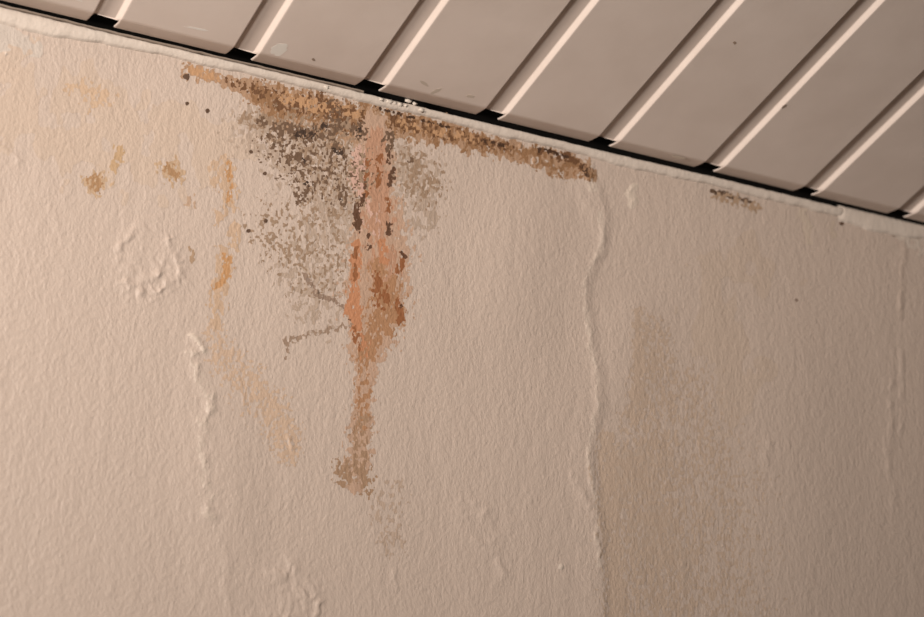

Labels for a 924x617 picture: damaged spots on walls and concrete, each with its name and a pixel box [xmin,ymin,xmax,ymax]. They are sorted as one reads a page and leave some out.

leakage [0,36,598,360]
rust [331,105,422,500]